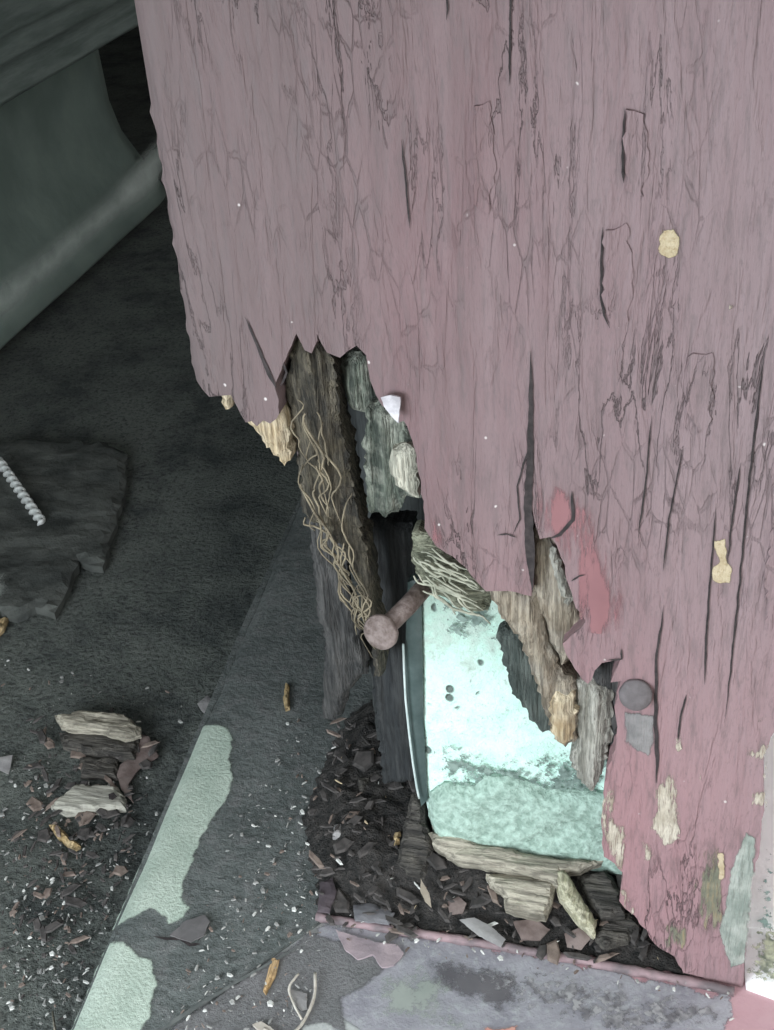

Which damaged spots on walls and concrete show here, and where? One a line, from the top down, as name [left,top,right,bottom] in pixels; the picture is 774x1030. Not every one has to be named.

crack [619,111,627,183]
crack [600,227,610,328]
peeling [601,223,634,329]
peeling [381,394,401,423]
crack [499,351,575,590]
crack [638,415,652,537]
peeling [540,489,621,634]
crack [653,352,765,782]
peeling [625,712,654,756]
peeling [651,776,680,846]
peeling [295,925,733,1030]
mould [747,870,774,980]